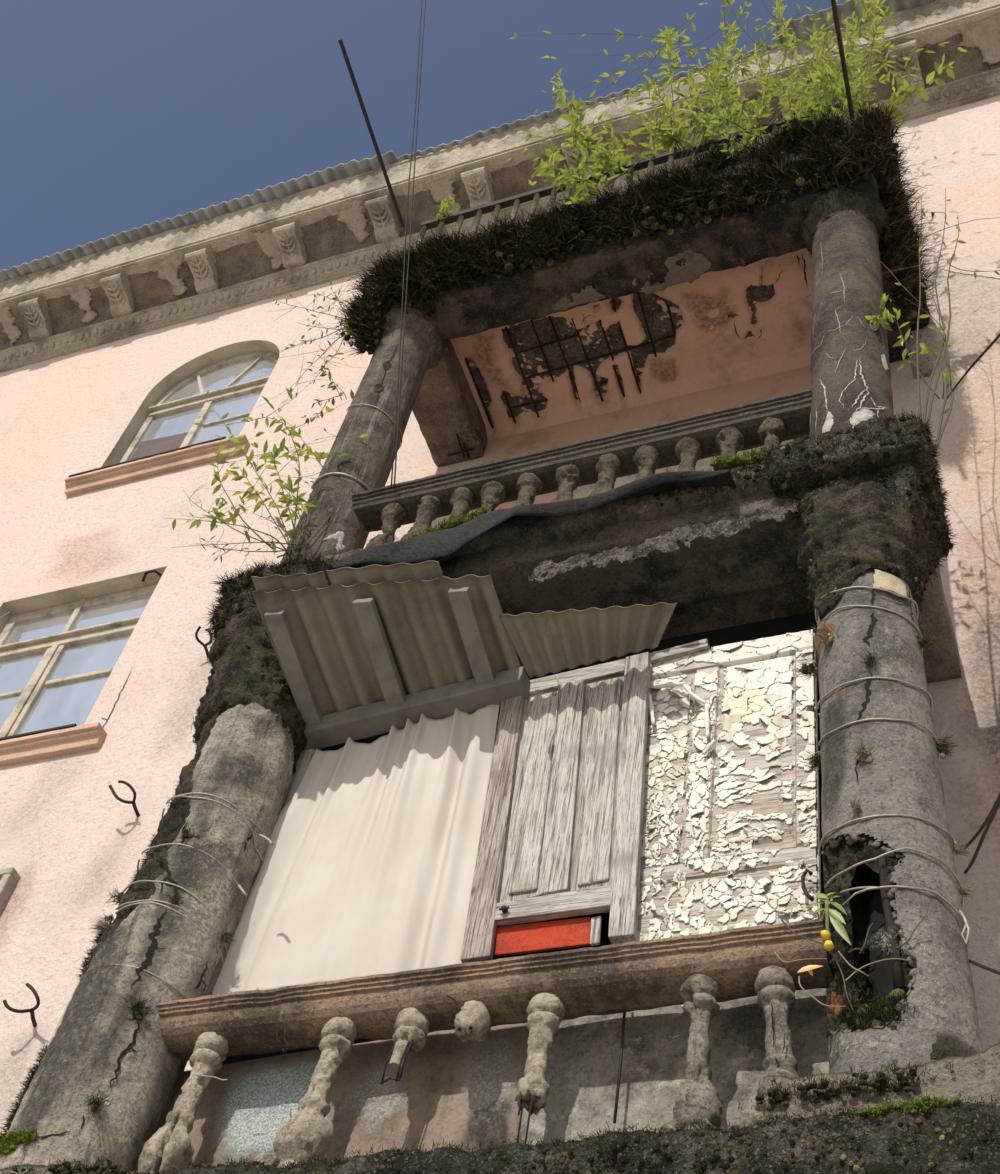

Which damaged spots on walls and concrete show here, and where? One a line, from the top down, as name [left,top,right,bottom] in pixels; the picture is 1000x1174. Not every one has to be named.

peeling [334,196,371,243]
peeling [0,303,22,347]
peeling [61,279,98,323]
peeling [148,254,187,296]
flaking render [465,250,712,429]
flaking render [745,276,775,338]
crack [764,232,894,433]
spalling [528,499,801,584]
crack [839,586,878,782]
peeling [637,553,922,1039]
crack [131,821,200,987]
crack [106,1021,140,1092]